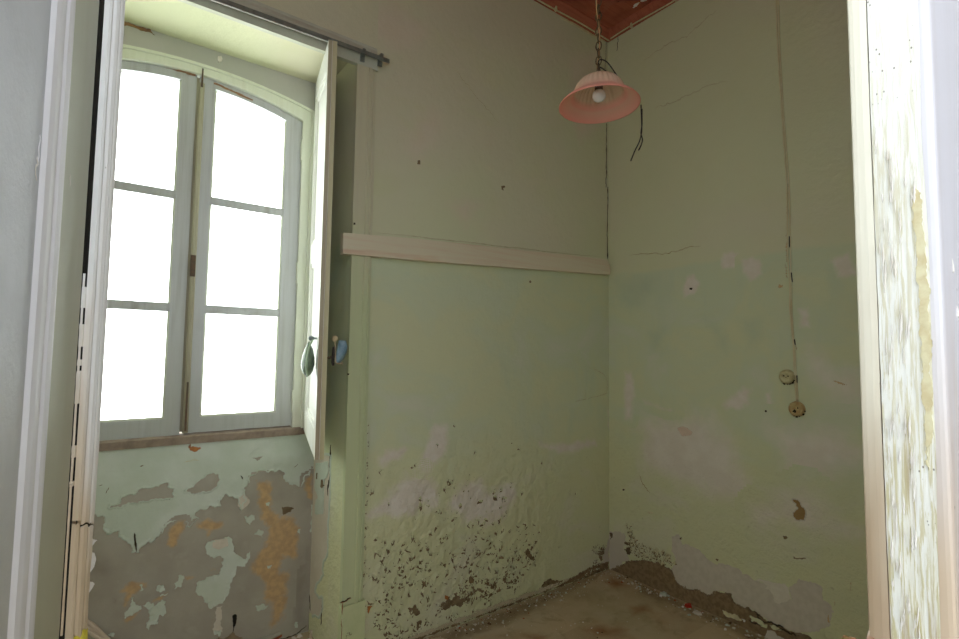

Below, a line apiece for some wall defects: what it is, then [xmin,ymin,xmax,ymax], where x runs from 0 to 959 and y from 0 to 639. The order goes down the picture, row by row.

crack [382,123,608,259]
peeling [735,331,867,568]
peeling [875,134,934,590]
peeling [88,453,332,639]
water stain [407,560,812,639]
peeling [540,523,834,633]